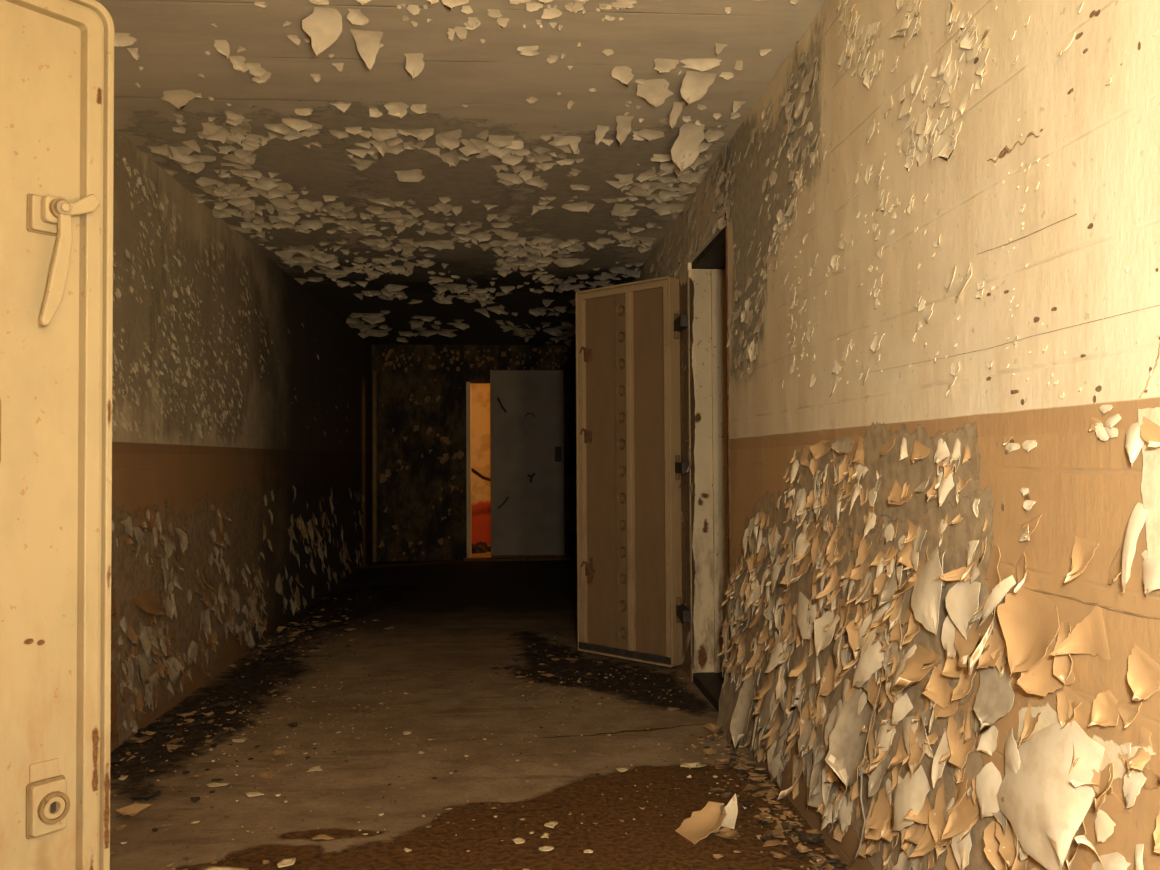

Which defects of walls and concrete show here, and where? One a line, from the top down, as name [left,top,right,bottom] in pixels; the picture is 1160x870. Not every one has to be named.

peeling [114,33,143,88]
peeling [205,23,271,84]
peeling [283,0,384,72]
peeling [397,0,637,43]
peeling [836,0,922,89]
peeling [1060,31,1088,55]
peeling [854,0,995,397]
peeling [945,262,1018,321]
peeling [112,42,853,669]
peeling [830,332,884,396]
peeling [1047,373,1160,597]
peeling [717,422,1160,870]